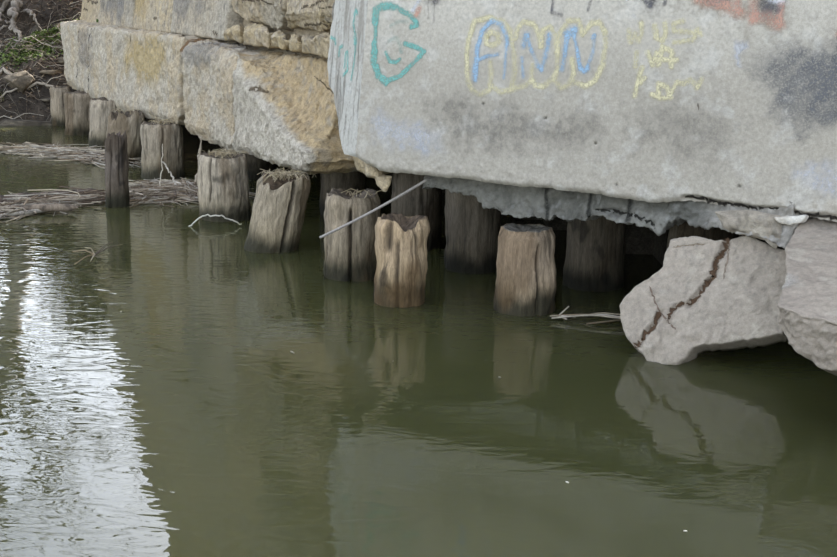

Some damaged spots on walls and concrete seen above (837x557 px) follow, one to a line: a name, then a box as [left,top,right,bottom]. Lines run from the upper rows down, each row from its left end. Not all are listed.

spalling [715,210,809,249]